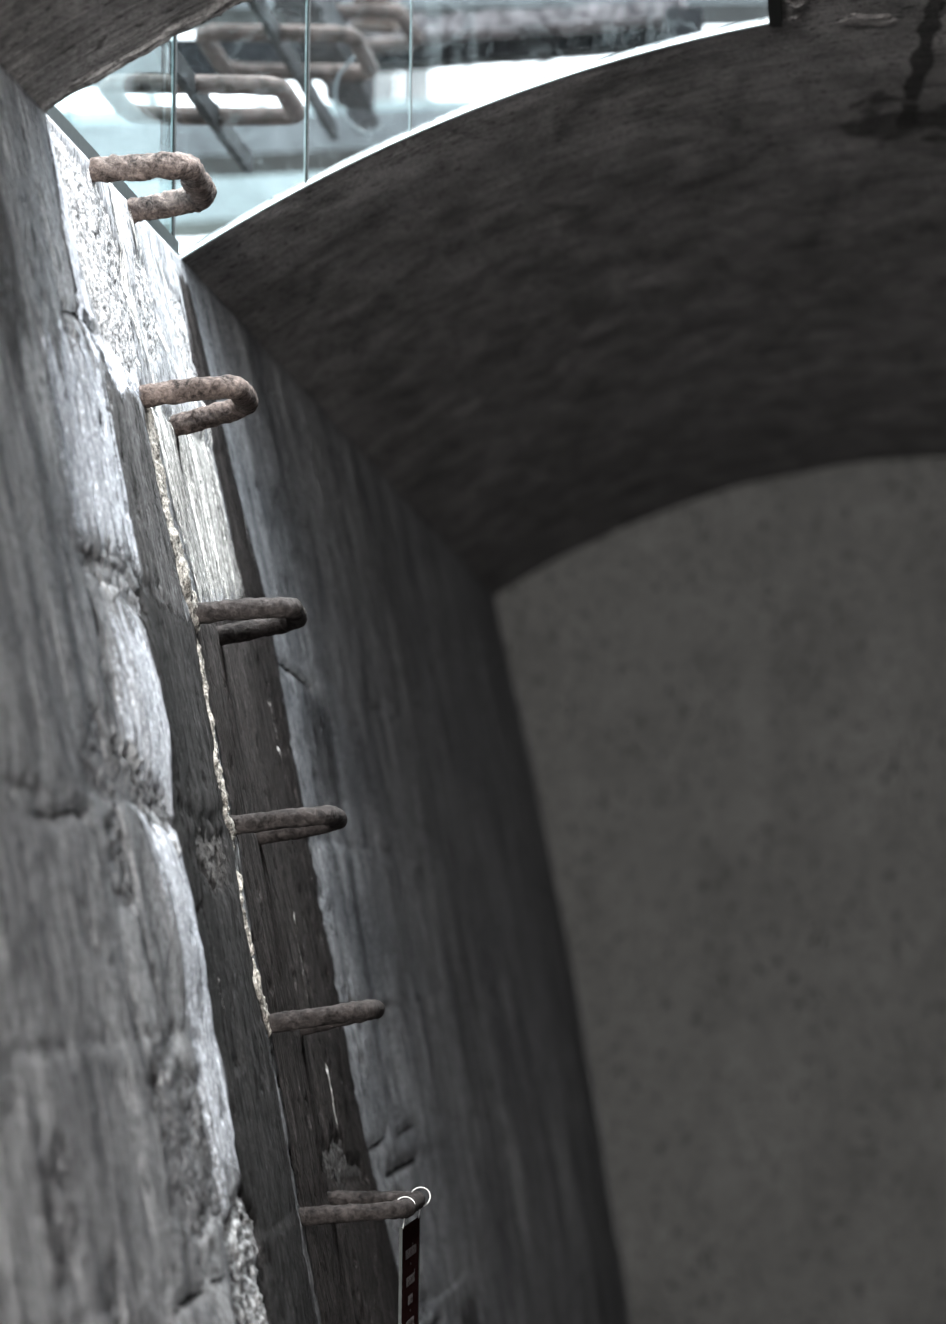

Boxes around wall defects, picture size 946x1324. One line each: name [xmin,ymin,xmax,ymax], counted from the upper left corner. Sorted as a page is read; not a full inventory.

leakage [839,0,946,142]
corrosion [178,271,211,377]
corrosion [210,425,266,599]
corrosion [196,619,303,815]
corrosion [235,833,340,1014]
corrosion [271,1026,378,1207]
corrosion [304,1219,399,1324]